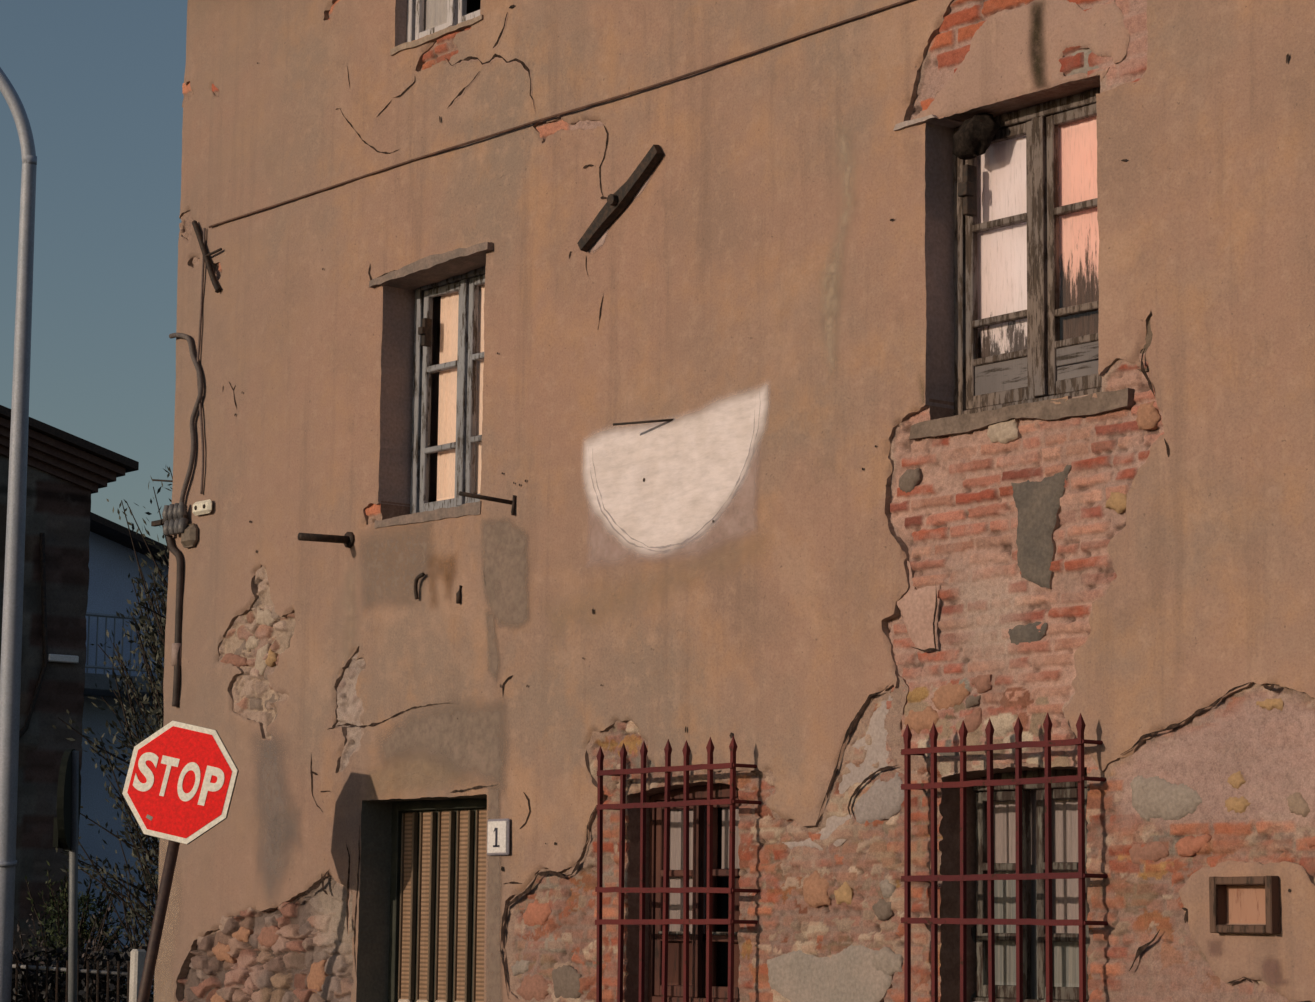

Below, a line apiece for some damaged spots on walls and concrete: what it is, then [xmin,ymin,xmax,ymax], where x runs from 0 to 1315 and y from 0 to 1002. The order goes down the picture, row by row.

crack [335,67,415,154]
crack [445,14,536,113]
crack [583,124,608,199]
spalling [910,0,1148,128]
leakage [1031,5,1043,86]
spalling [218,550,296,739]
spalling [335,651,366,772]
spalling [505,315,1315,1002]
spalling [177,875,354,1002]